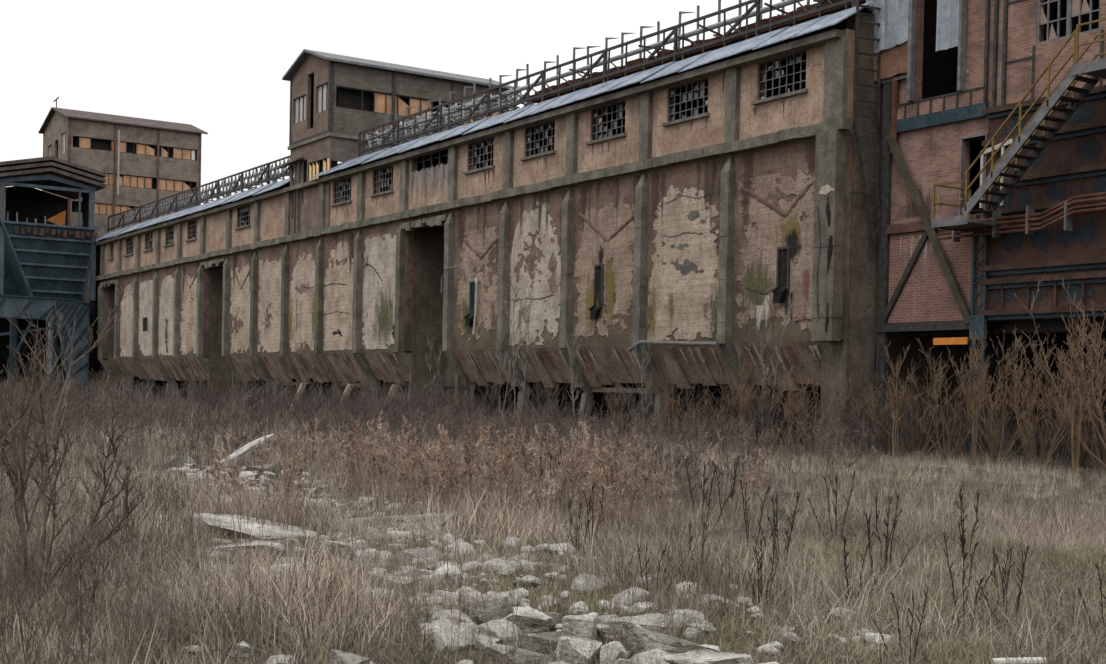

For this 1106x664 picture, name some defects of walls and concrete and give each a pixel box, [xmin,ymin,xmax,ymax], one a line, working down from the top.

peeling [230,233,396,354]
peeling [457,201,561,346]
peeling [574,196,635,339]
peeling [647,185,719,341]
peeling [735,168,834,331]